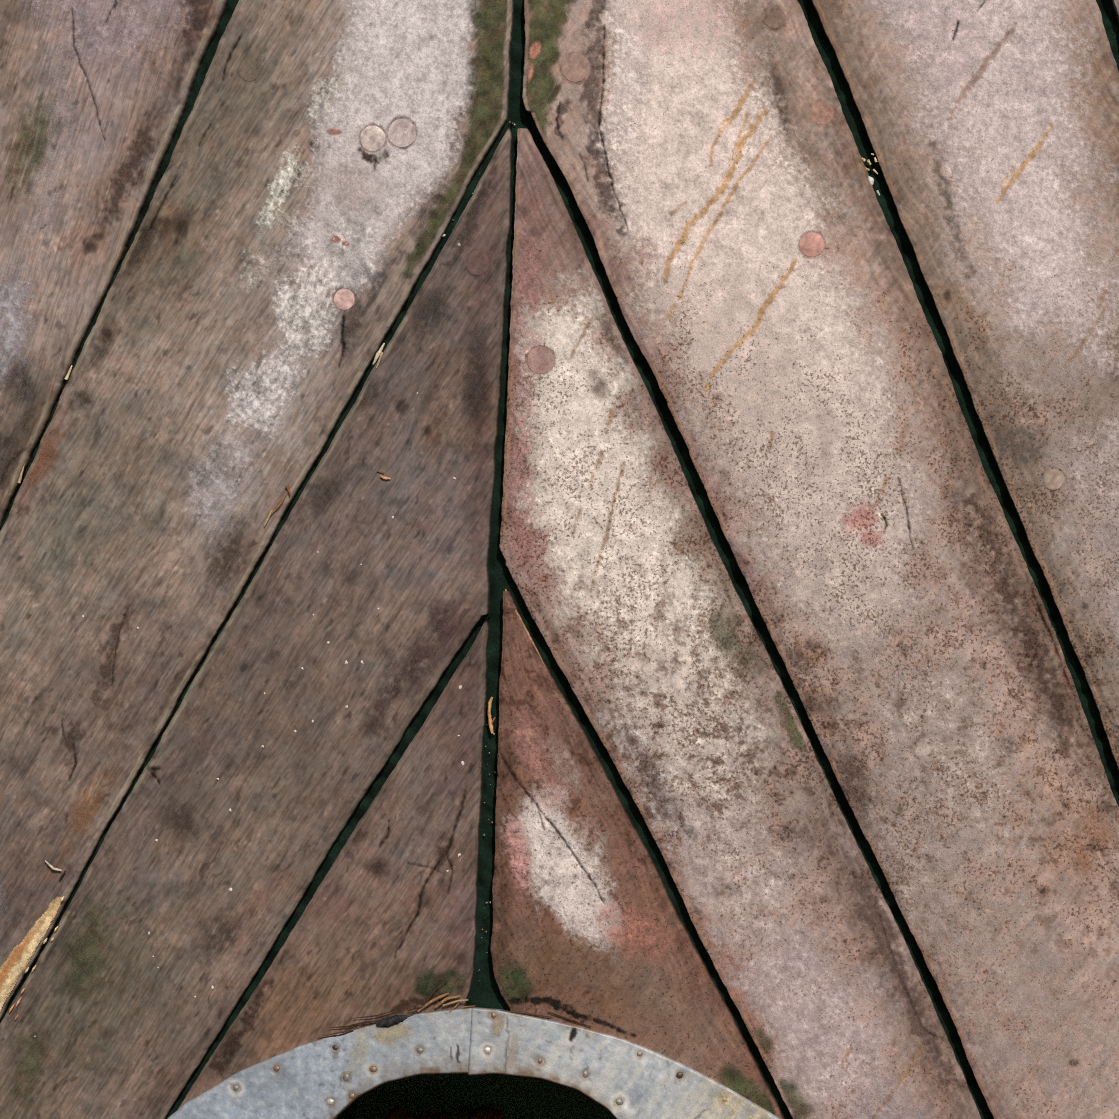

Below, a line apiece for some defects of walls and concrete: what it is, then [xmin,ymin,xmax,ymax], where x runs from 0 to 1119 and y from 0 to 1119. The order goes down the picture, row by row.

leakage [358,148,389,167]
rust [664,82,768,318]
rust [996,123,1053,202]
rust [705,260,796,390]
crack [399,797,465,948]
crack [503,759,603,901]
peeling [0,917,52,1009]